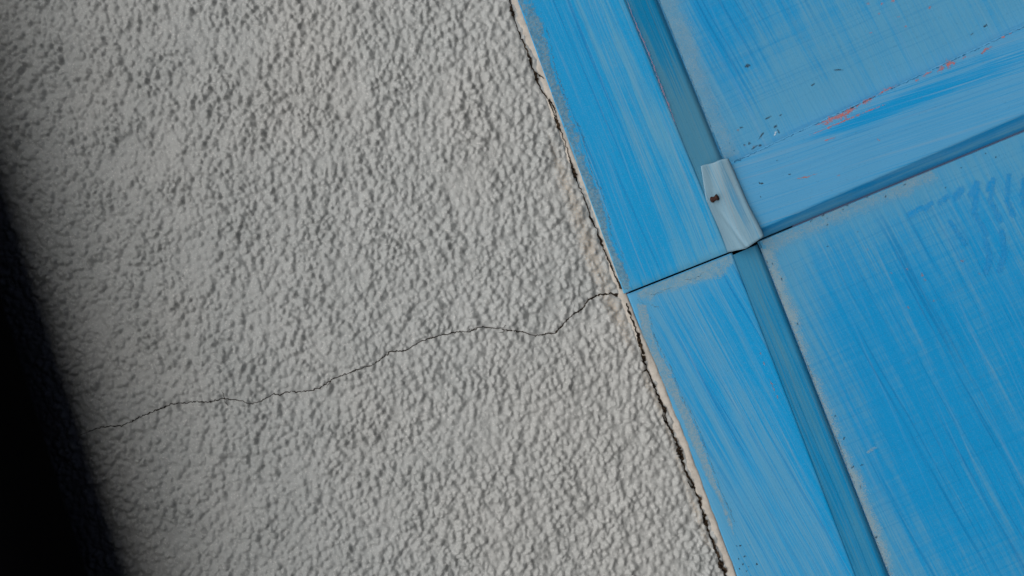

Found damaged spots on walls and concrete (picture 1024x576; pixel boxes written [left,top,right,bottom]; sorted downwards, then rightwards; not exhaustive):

crack [81,0,727,576]